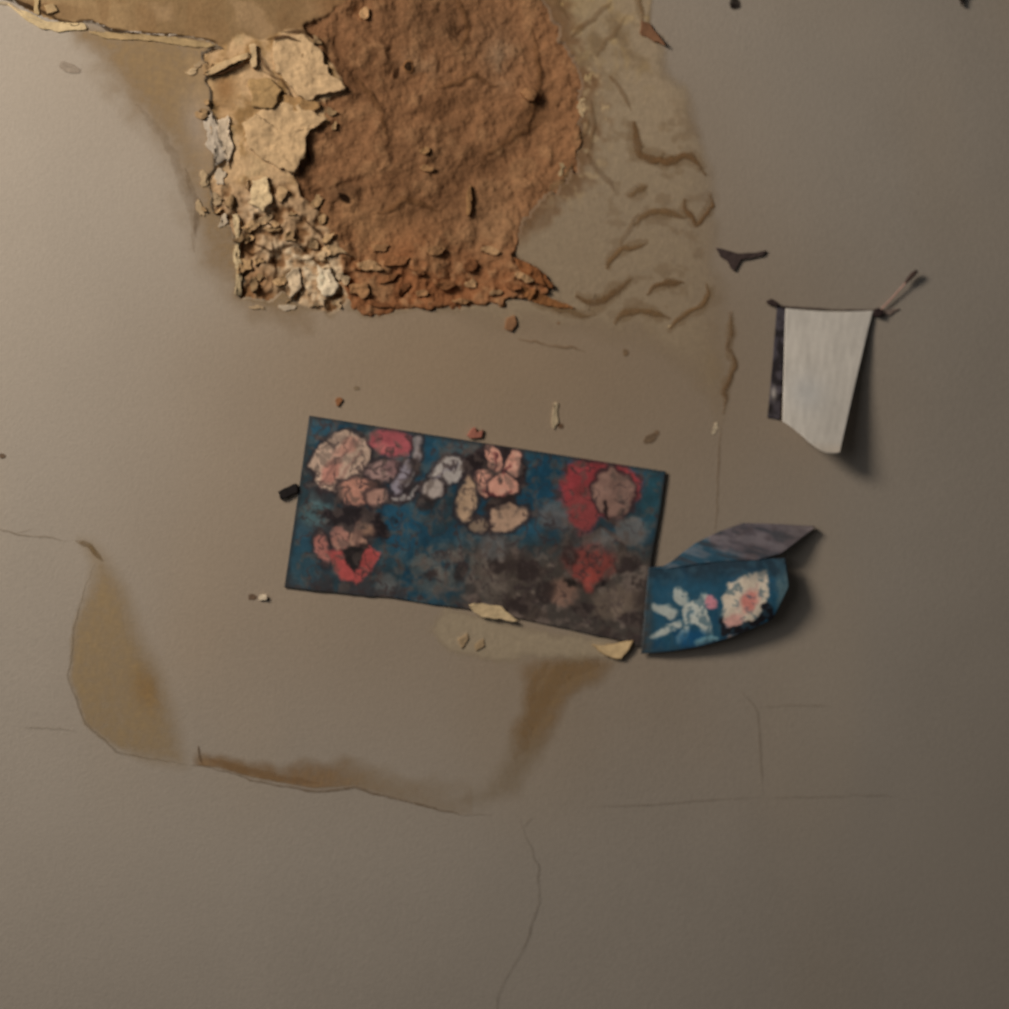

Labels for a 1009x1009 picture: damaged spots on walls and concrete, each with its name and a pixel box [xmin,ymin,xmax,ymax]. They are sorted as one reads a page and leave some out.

spalling [0,0,715,355]